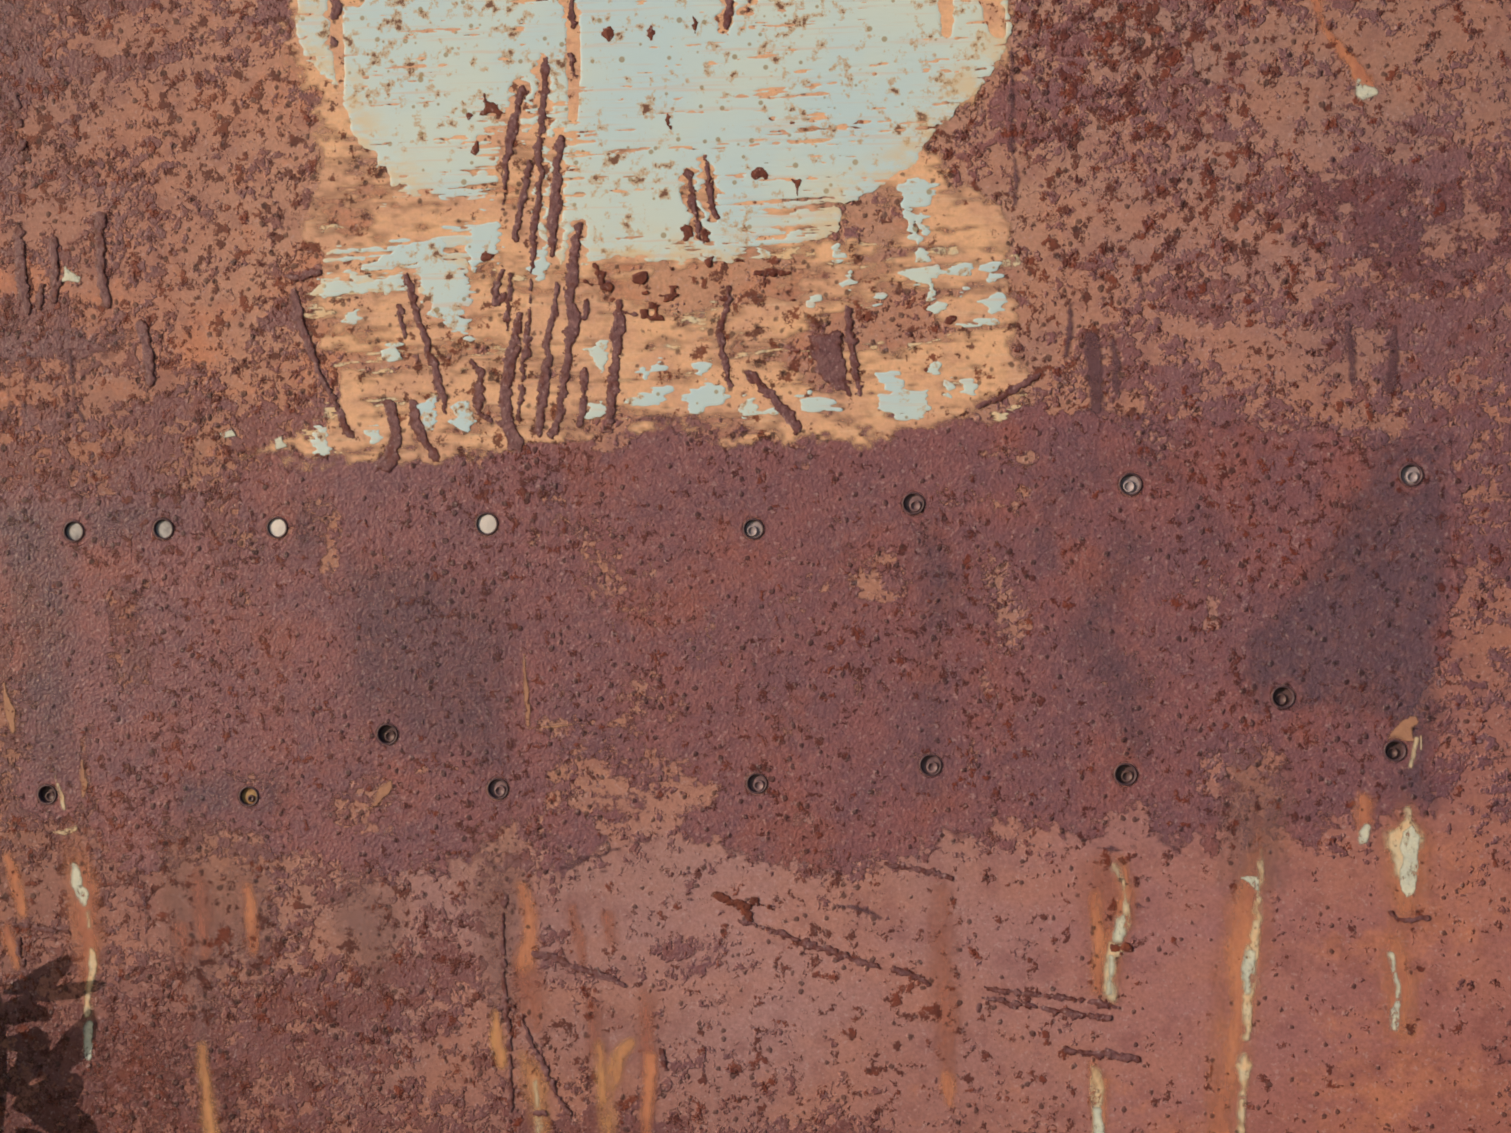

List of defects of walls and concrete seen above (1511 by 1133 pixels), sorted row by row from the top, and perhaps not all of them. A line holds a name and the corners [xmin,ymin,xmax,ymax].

corrosion [601,26,614,42]
peeling [1325,28,1378,99]
corrosion [466,93,506,120]
corrosion [751,167,768,181]
peeling [257,0,1032,469]
corrosion [680,224,710,243]
corrosion [1294,159,1511,334]
corrosion [583,263,606,286]
corrosion [0,318,126,371]
corrosion [808,330,852,397]
corrosion [0,400,1465,1133]